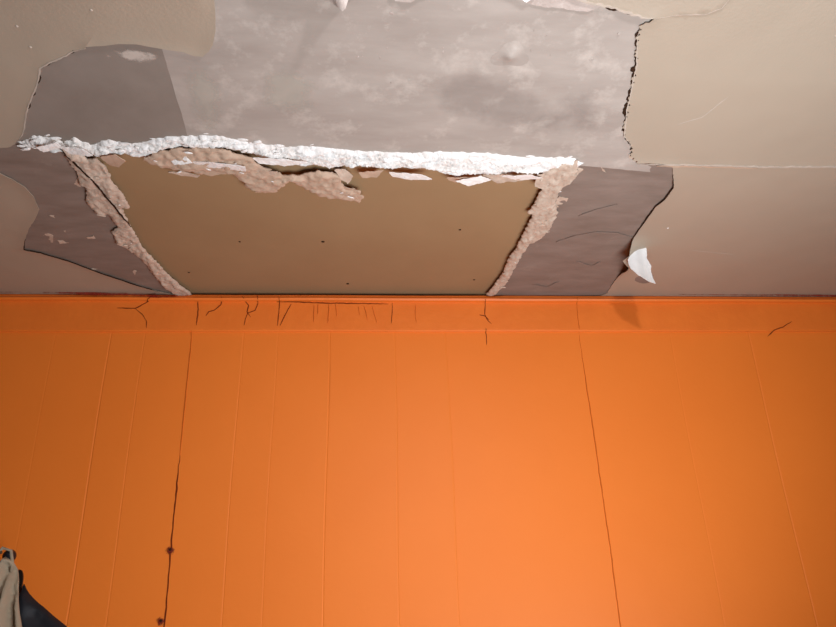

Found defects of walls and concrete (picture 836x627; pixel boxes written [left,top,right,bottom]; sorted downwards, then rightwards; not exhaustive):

peeling [0,0,674,296]
crack [277,300,393,326]
crack [164,297,222,627]